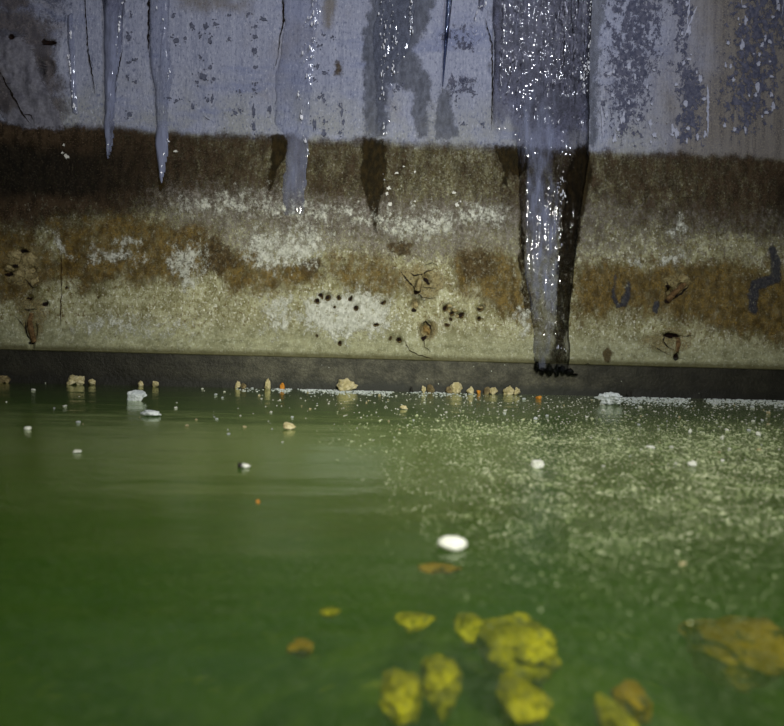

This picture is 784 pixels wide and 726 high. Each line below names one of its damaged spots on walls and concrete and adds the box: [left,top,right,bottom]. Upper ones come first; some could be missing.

crack [0,72,35,126]
peeling [595,0,784,150]
damp [0,0,784,376]
spalling [4,247,48,344]
spalling [314,293,358,311]
spalling [643,328,695,360]
rust [574,258,784,344]